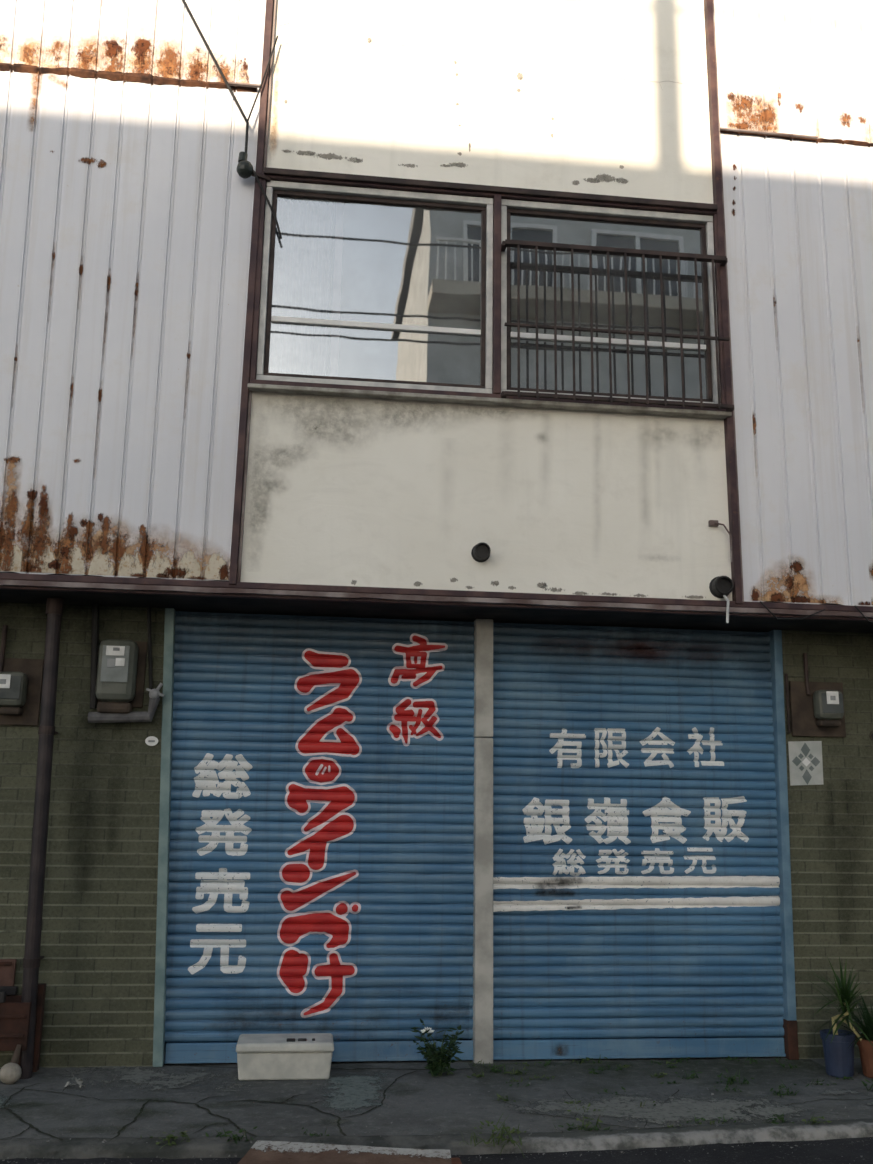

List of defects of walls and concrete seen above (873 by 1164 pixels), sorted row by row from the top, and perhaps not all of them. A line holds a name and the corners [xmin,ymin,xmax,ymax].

rust [0,37,257,124]
rust [720,92,873,147]
peeling [283,150,363,163]
rust [0,456,230,580]
rust [751,561,838,604]
crack [0,1068,425,1141]